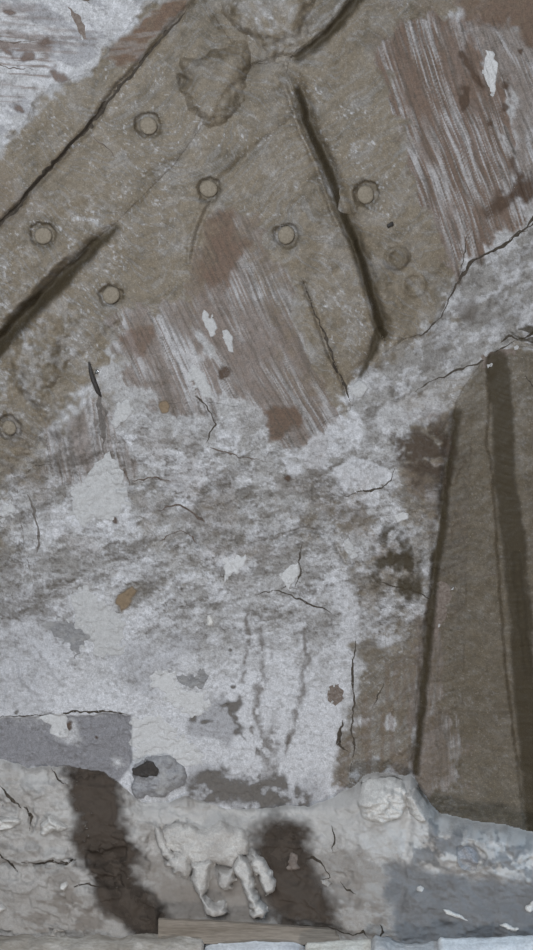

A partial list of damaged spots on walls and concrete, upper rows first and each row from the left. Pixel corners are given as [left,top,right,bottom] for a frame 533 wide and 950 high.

peeling [68,7,87,40]
peeling [482,50,498,97]
crack [386,216,533,354]
peeling [202,310,233,352]
peeling [187,364,214,399]
crack [415,334,533,392]
crack [96,395,205,544]
rust [115,587,136,611]
damp [372,410,461,775]
damp [486,352,533,832]
crack [336,632,384,771]
crack [0,786,34,831]